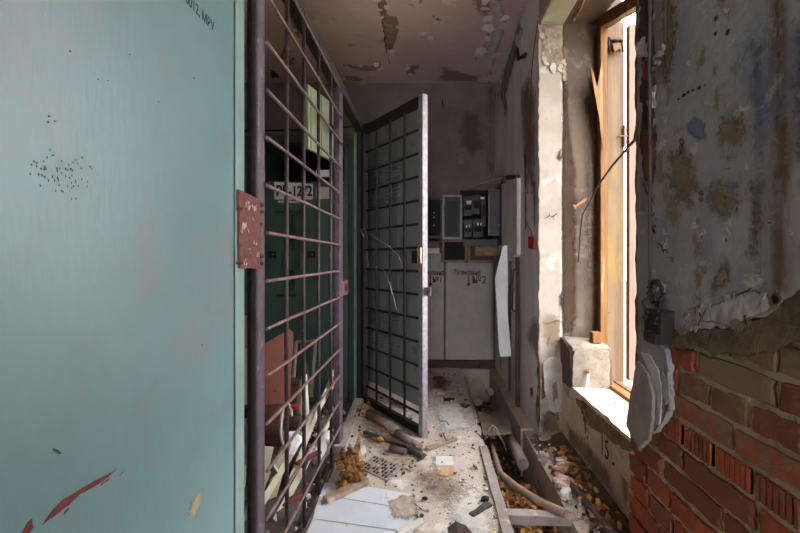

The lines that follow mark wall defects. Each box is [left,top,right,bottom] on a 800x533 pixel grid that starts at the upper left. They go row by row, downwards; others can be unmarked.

spalling [374,0,403,54]
peeling [473,0,523,117]
spalling [540,24,567,82]
spalling [671,290,800,357]
peeling [575,352,671,453]